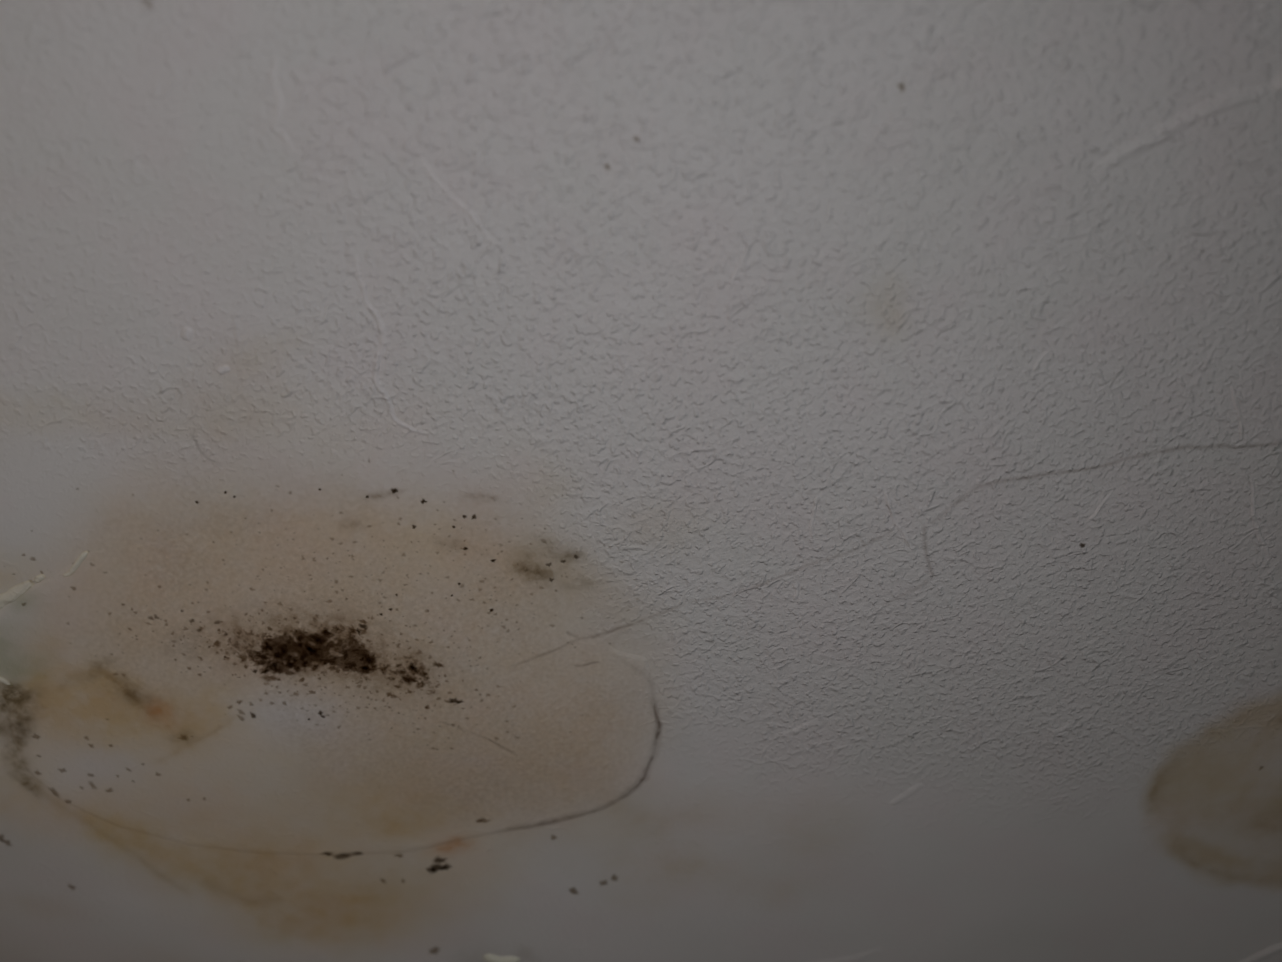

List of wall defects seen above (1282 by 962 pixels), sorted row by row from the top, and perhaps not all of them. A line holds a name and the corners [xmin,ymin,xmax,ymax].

water stain [249,621,376,679]
water stain [427,858,449,872]